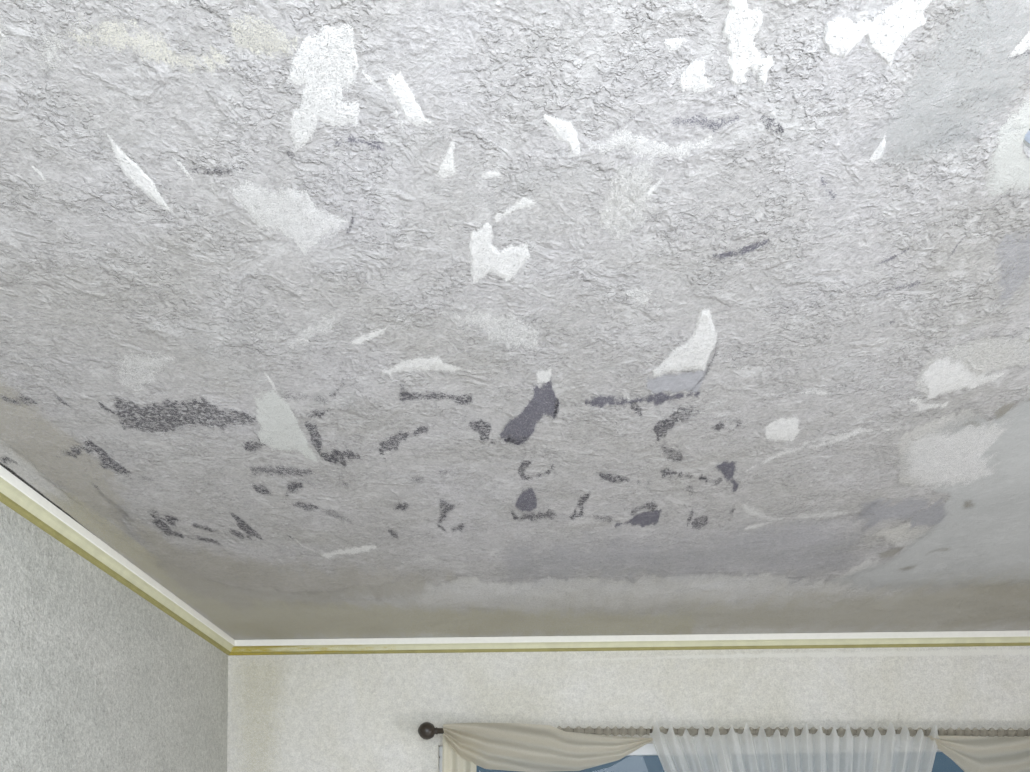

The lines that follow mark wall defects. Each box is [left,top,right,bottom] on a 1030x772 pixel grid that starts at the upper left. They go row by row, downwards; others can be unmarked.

peeling [0,0,1030,597]